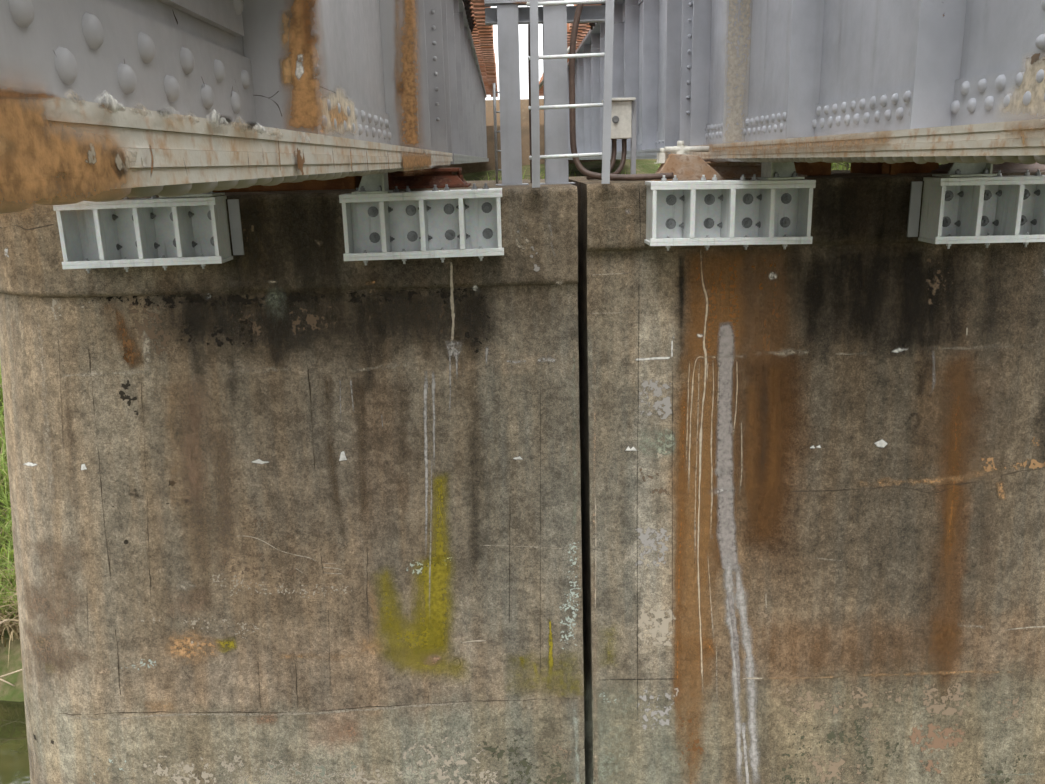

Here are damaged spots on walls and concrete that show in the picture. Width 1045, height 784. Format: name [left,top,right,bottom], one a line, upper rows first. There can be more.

corrosion [0,86,128,205]
corrosion [294,148,305,175]
corrosion [282,0,324,133]
corrosion [396,0,431,170]
corrosion [712,138,887,151]
damp [900,186,911,238]
corrosion [116,311,141,366]
damp [92,201,490,408]
damp [806,251,968,353]
damp [423,374,435,583]
corrosion [675,254,744,768]
corrosion [981,457,1045,472]